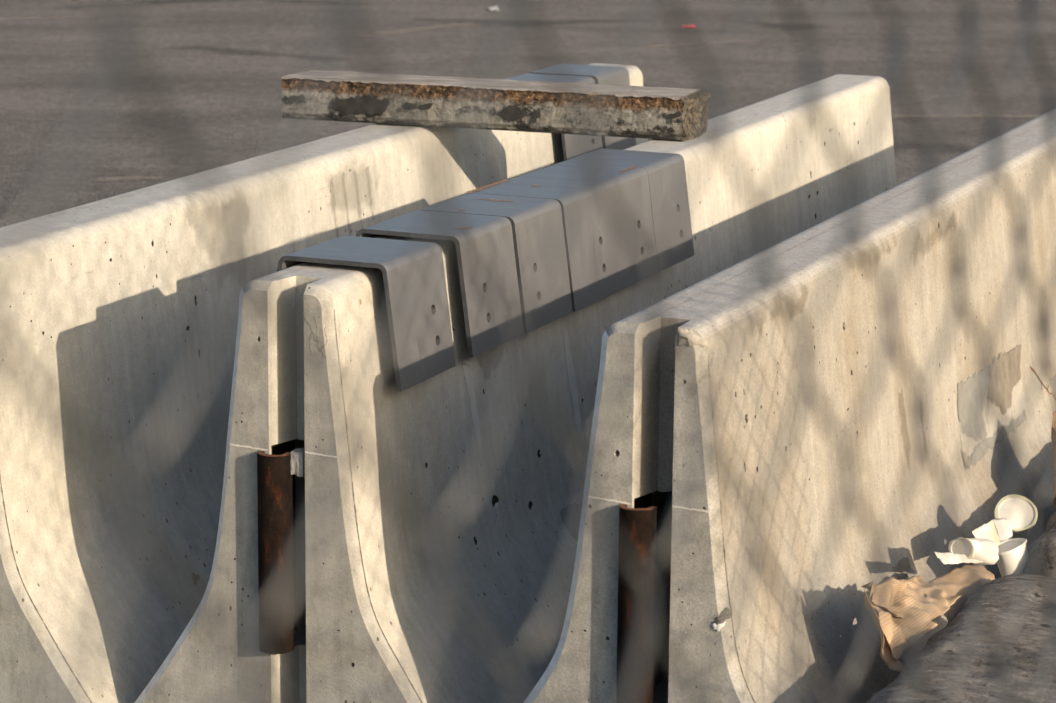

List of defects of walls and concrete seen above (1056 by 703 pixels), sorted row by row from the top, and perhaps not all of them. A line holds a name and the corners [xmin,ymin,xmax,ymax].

peeling [958,344,1021,469]